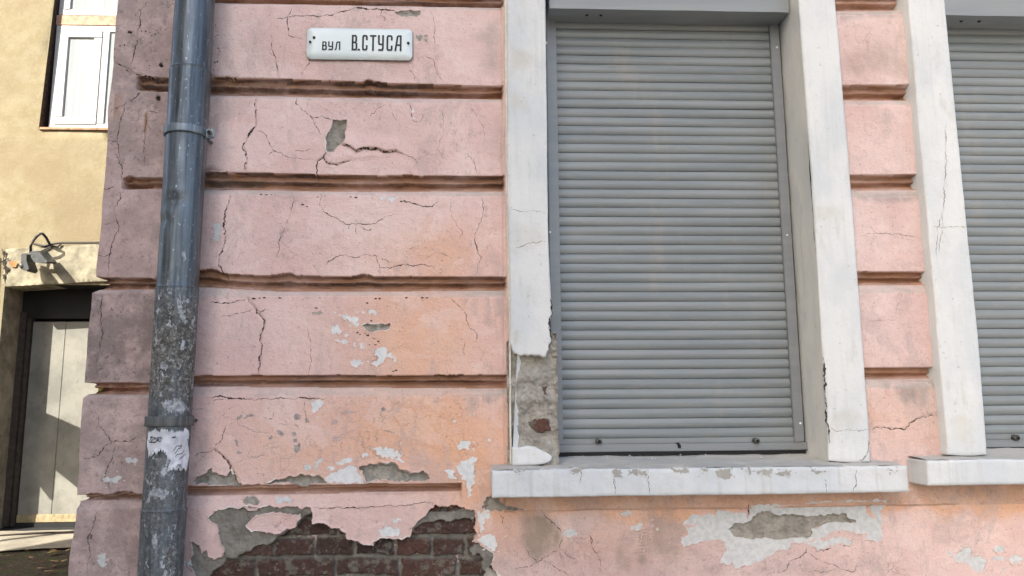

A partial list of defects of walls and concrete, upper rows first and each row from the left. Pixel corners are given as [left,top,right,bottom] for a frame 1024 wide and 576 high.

crack [99,2,166,276]
flaking render [323,118,349,154]
crack [242,7,484,274]
crack [868,122,963,254]
crack [84,418,137,490]
crack [211,196,266,371]
crack [213,332,323,426]
flaking render [184,399,527,576]
peeling [312,297,402,372]
flaking render [506,332,583,475]
peeling [680,497,888,570]
crack [823,359,932,491]